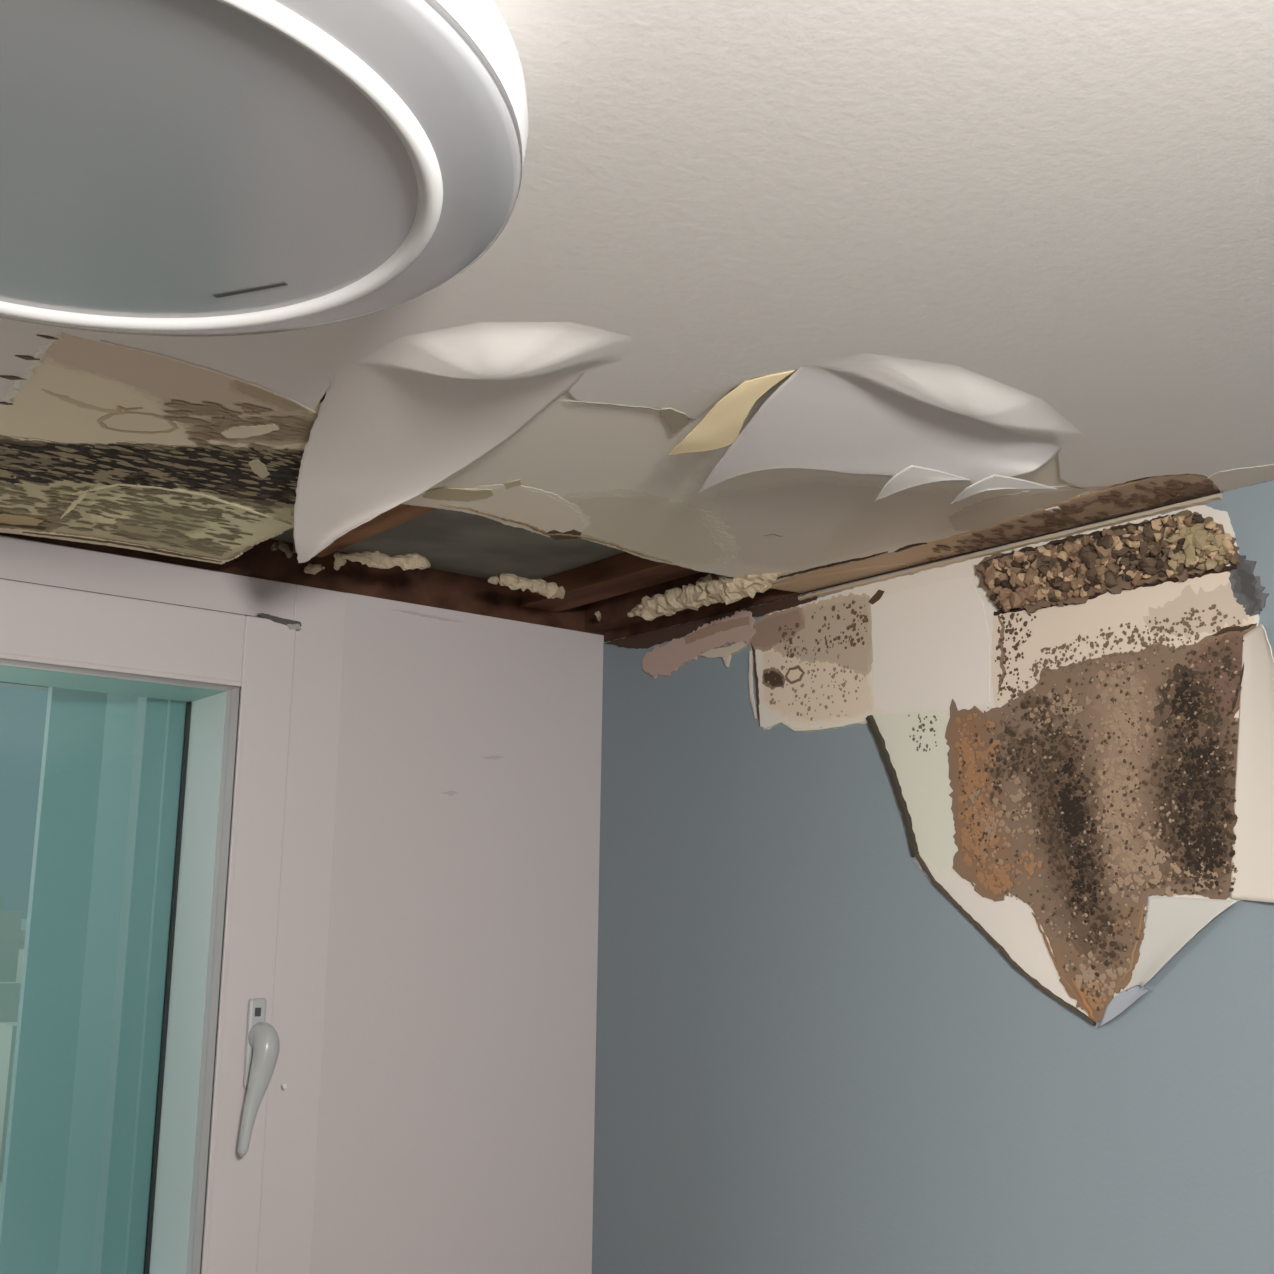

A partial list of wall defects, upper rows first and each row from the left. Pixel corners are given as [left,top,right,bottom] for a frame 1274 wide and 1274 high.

damp [0,332,319,560]
peeling [221,423,279,439]
peeling [249,459,270,479]
spalling [405,484,672,563]
damp [423,394,1274,570]
damp [684,593,873,721]
flaking render [751,648,889,729]
flaking render [768,505,1239,713]
flaking render [914,856,1097,1023]
flaking render [1142,894,1210,932]